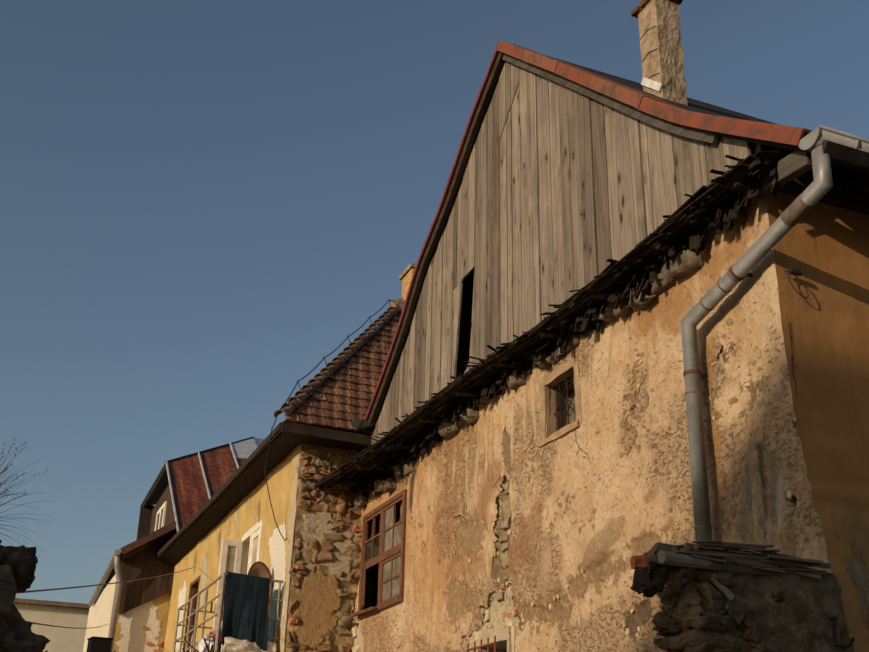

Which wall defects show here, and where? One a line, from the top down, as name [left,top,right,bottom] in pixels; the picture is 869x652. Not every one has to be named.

peeling [115,600,164,652]
peeling [269,454,354,652]
spalling [351,618,364,652]
spalling [437,424,674,649]